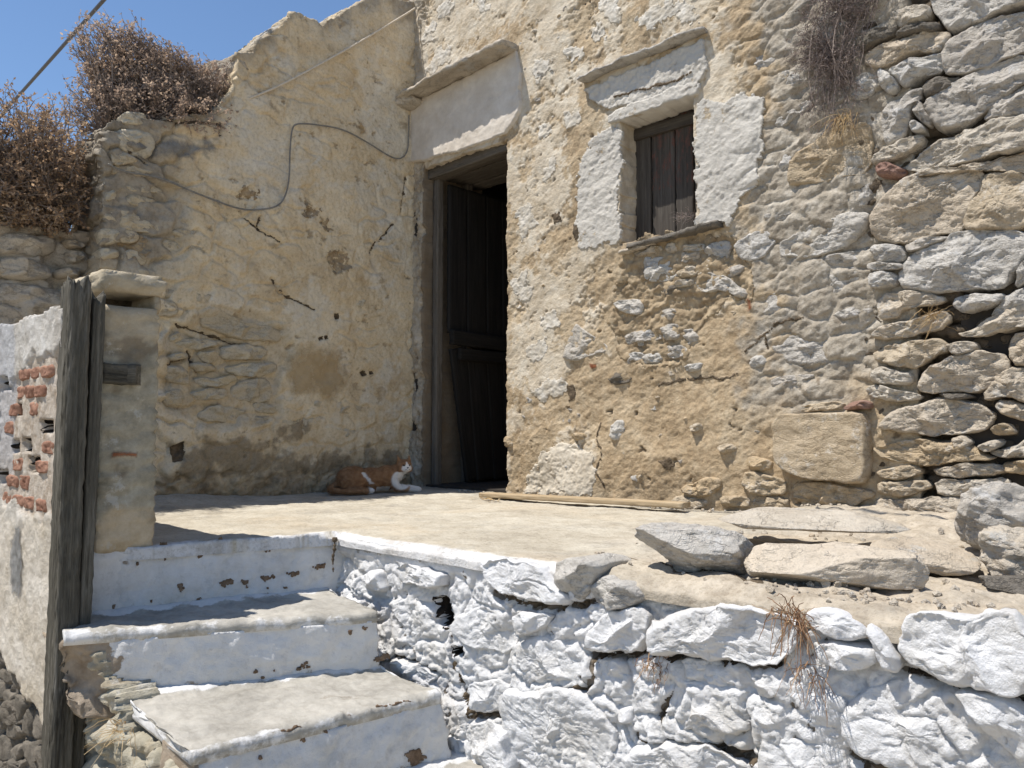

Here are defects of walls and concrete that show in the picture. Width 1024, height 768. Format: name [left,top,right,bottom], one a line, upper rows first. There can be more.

crack [244,217,280,243]
crack [369,177,407,254]
crack [271,279,315,310]
crack [167,323,240,373]
crack [595,422,605,488]
peeling [219,571,300,589]